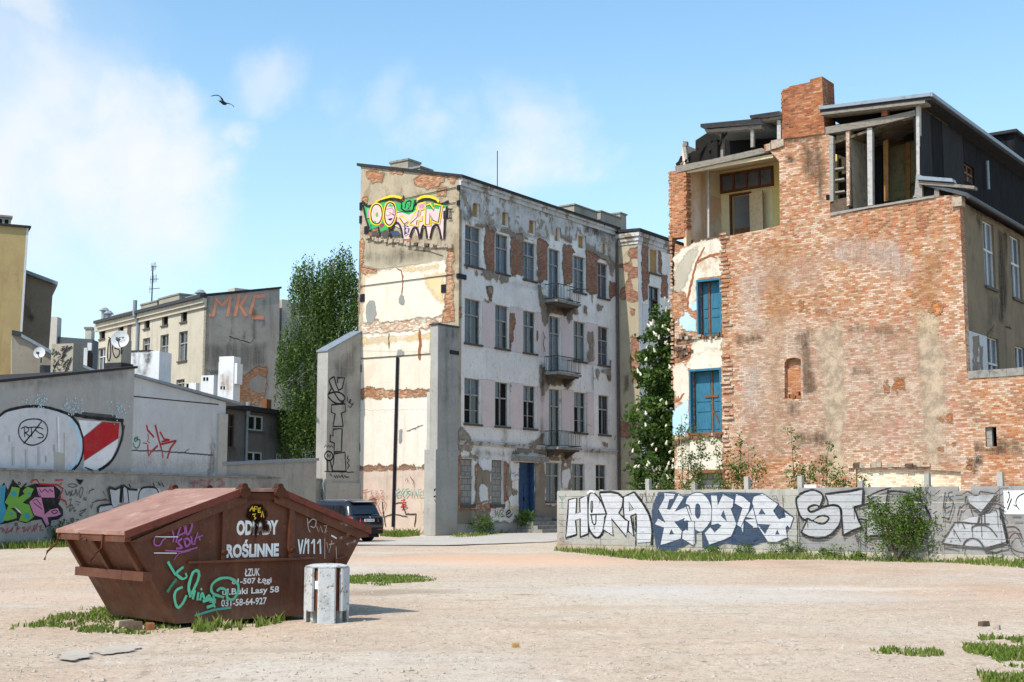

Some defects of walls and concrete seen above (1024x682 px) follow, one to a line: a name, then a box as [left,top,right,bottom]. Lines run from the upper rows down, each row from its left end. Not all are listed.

peeling [358,169,697,384]
peeling [686,347,723,369]
flaking render [240,365,268,405]
flaking render [361,386,429,401]
flaking render [360,463,424,472]
peeling [458,427,579,525]